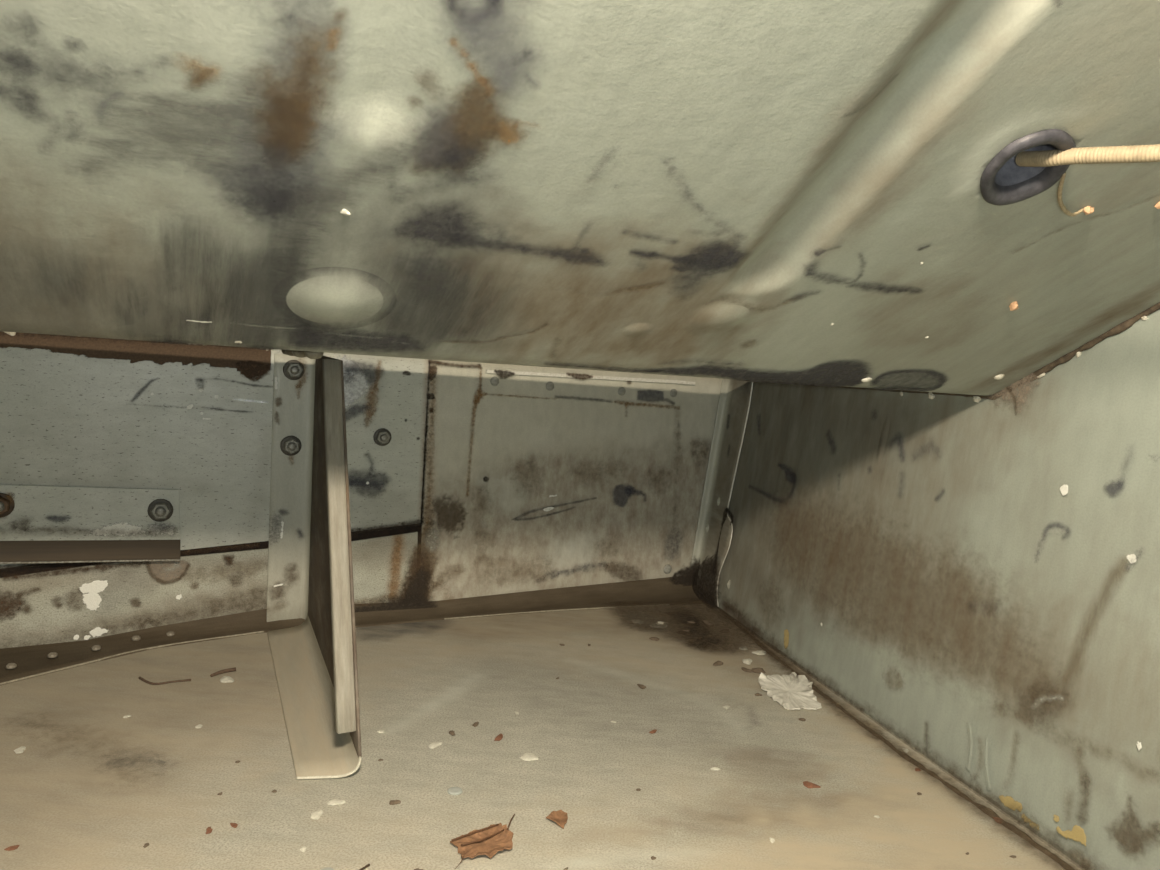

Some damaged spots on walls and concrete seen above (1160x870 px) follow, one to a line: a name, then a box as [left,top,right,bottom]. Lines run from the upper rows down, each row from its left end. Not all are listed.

rust [414,40,517,171]
rust [351,360,484,605]
rust [182,542,260,565]
rust [0,561,147,620]
peeling [68,580,108,611]
peeling [73,627,108,640]